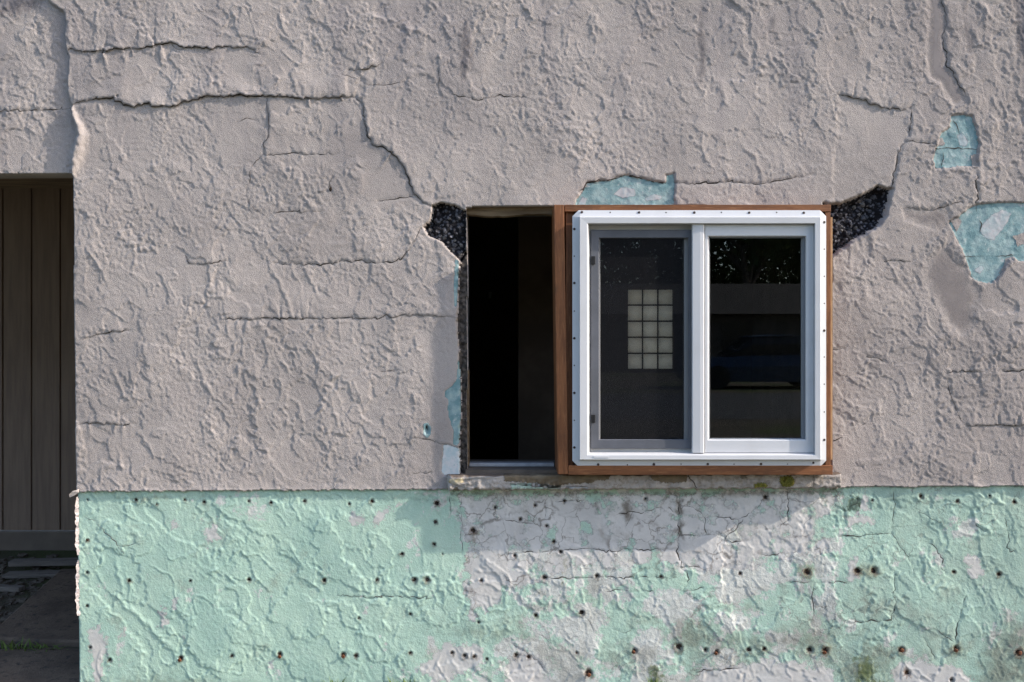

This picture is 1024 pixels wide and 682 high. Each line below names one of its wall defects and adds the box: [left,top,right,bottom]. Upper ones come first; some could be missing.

crack [68,42,257,53]
crack [0,63,434,266]
peeling [575,175,675,205]
spalling [823,186,889,254]
crack [843,95,930,187]
peeling [950,203,1024,283]
crack [227,313,458,321]
peeling [424,203,844,622]
crack [501,475,762,592]
peeling [420,642,552,682]
peeling [692,658,834,682]
peeling [890,654,975,682]